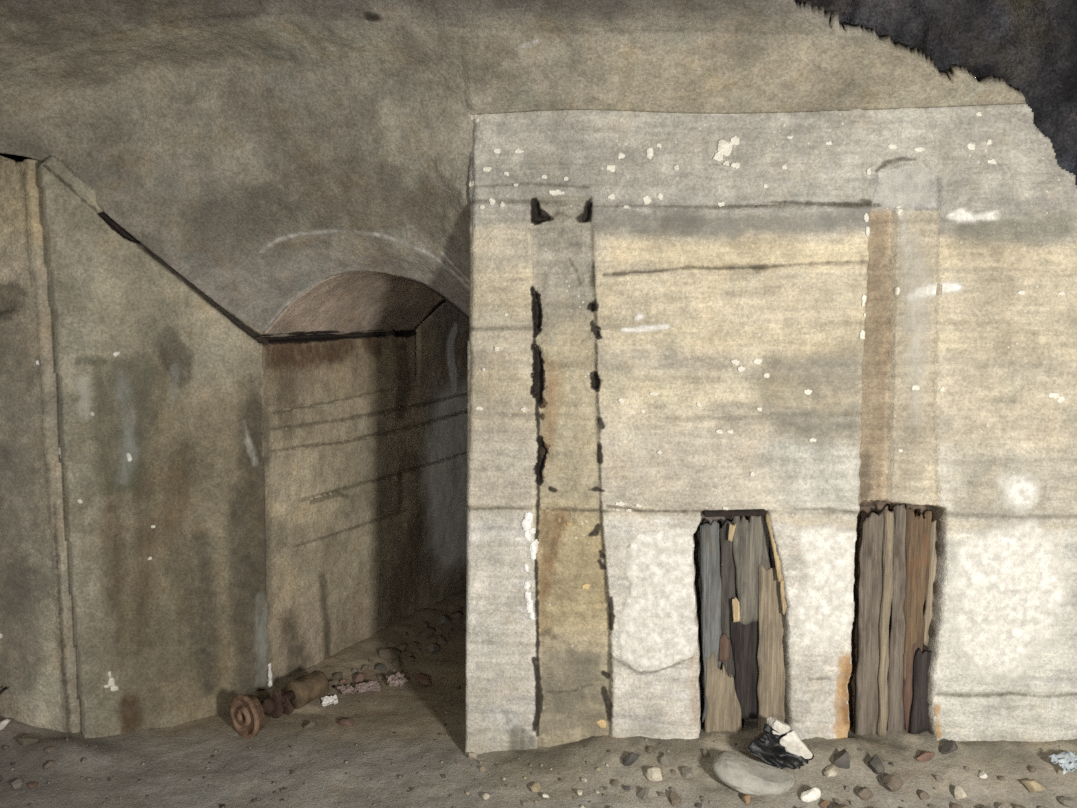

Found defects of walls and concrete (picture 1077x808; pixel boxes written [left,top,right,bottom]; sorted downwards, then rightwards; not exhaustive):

leakage [104,671,118,692]
crack [530,286,557,736]
crack [587,300,637,731]
rust [838,657,852,738]